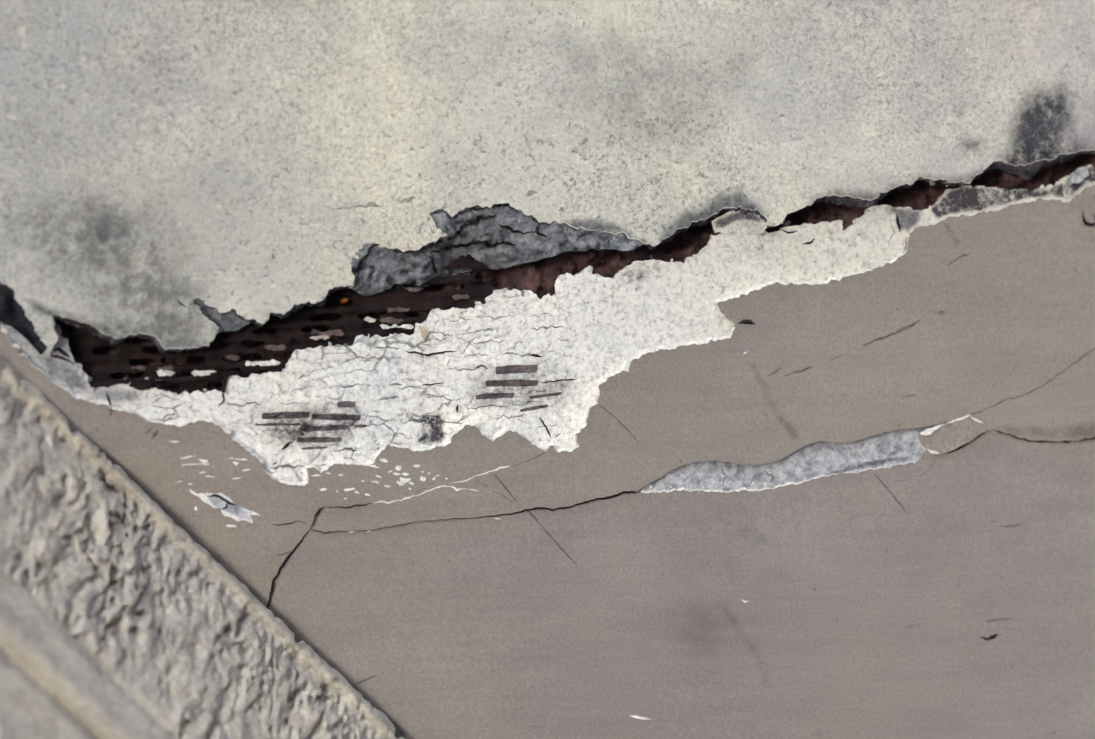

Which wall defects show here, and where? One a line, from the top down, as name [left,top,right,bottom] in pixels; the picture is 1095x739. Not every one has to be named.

water stain [1007,89,1069,165]
peeling [0,165,1095,499]
crack [949,389,1095,453]
spalling [178,456,260,527]
crack [267,465,637,609]